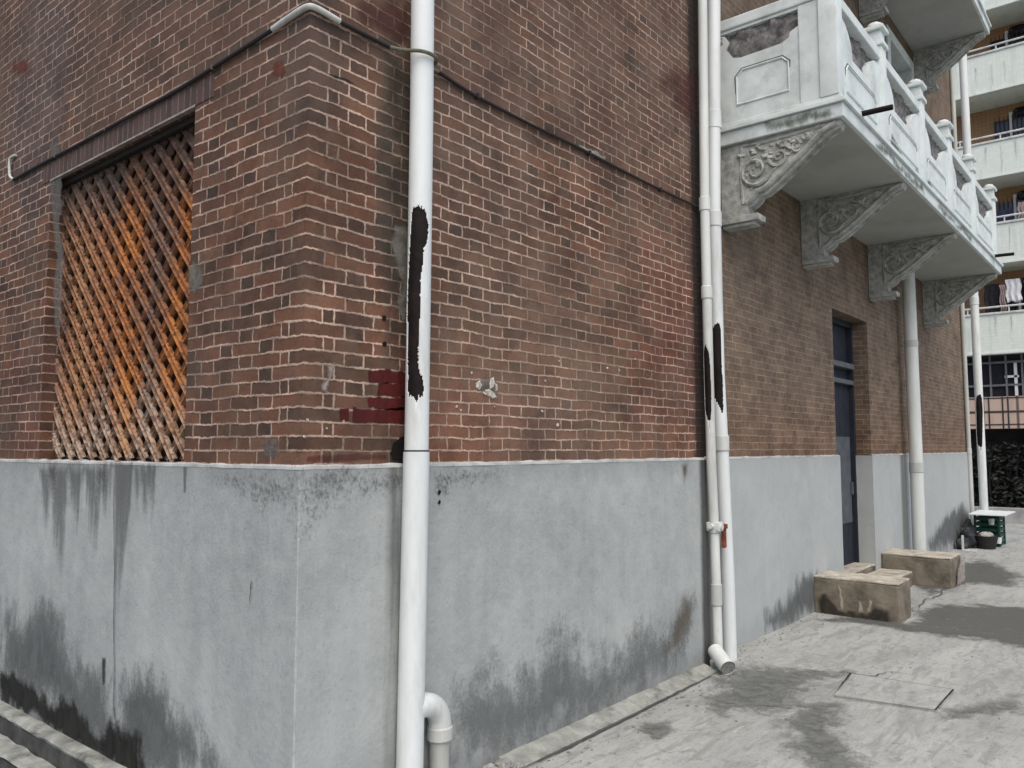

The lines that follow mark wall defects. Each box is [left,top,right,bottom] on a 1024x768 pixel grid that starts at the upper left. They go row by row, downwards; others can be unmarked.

spalling [471,371,498,407]
damp [42,463,155,527]
damp [0,598,214,768]
damp [458,620,685,749]